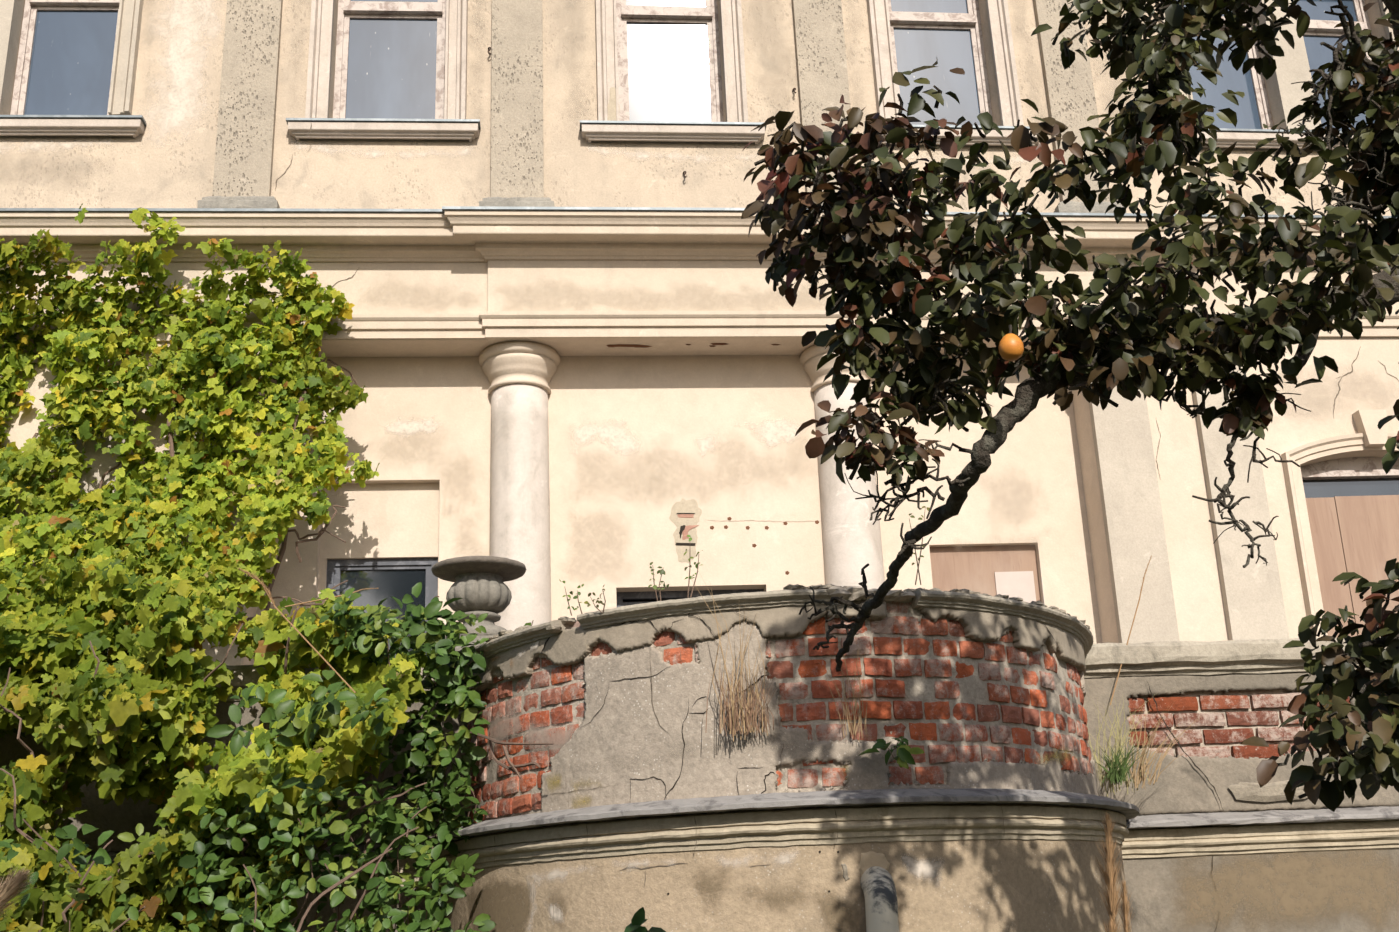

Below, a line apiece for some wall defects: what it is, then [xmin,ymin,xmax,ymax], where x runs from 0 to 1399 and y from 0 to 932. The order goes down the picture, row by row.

flaking render [653,631,700,665]
flaking render [465,642,615,823]
crack [553,610,764,854]
flaking render [1127,693,1324,759]
crack [620,816,697,886]